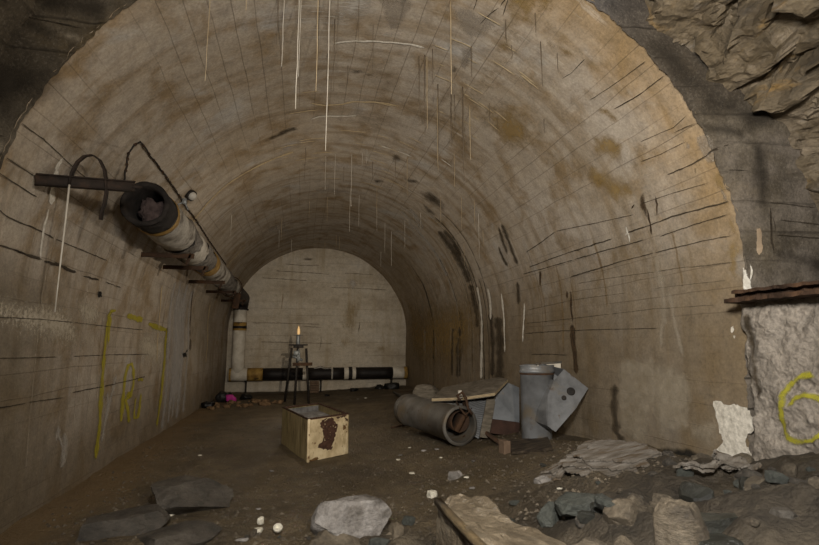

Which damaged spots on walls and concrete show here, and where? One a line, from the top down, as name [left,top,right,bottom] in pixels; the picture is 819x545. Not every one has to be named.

crack [615,76,663,109]
crack [641,117,695,162]
crack [524,145,738,277]
peeling [540,401,762,478]